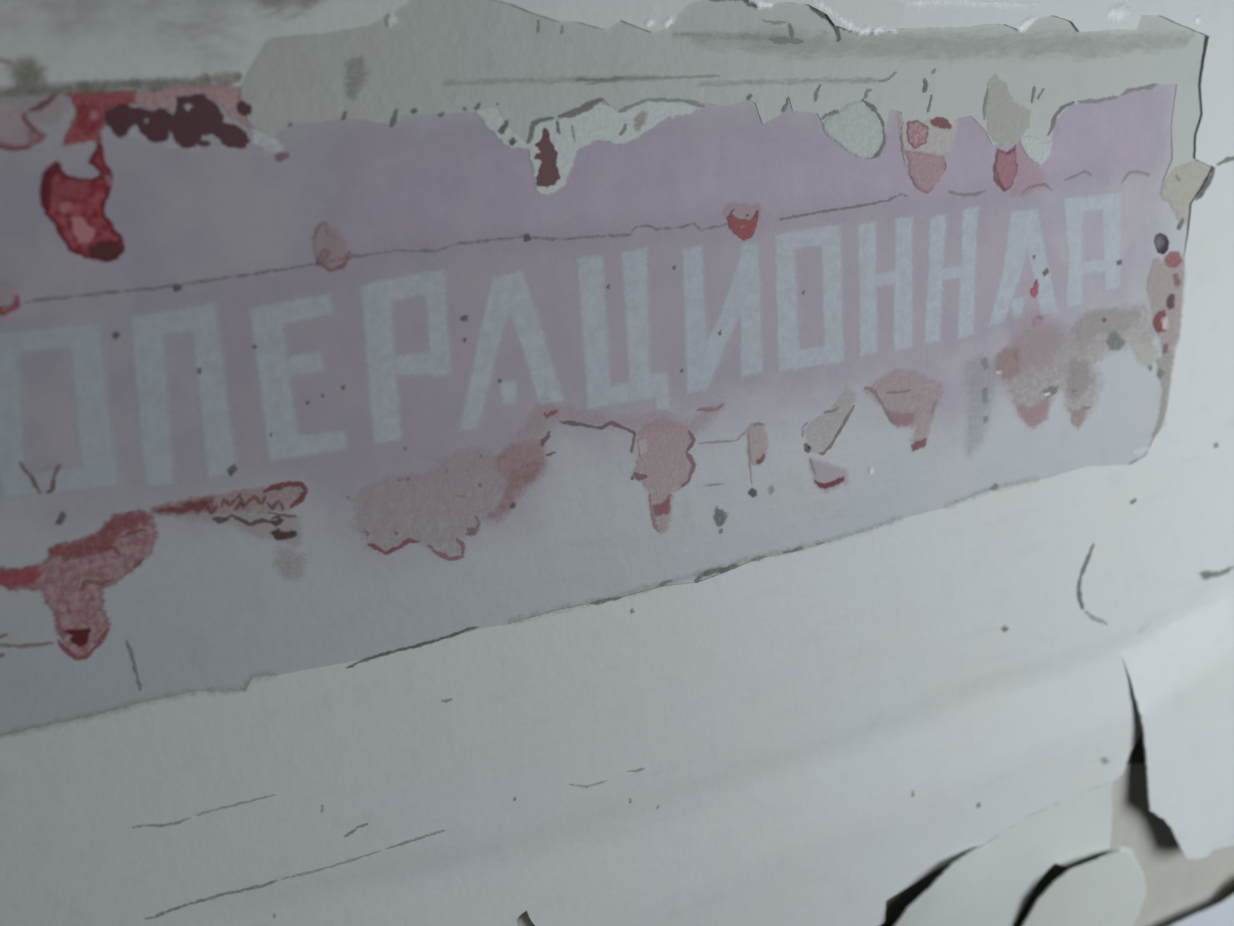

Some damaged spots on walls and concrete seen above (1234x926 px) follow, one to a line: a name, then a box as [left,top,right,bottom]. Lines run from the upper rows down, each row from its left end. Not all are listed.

peeling [40,0,1215,262]
peeling [1031,268,1049,297]
peeling [348,407,696,561]
peeling [713,422,774,497]
peeling [803,371,942,489]
crack [1077,544,1108,625]
peeling [893,595,1234,926]